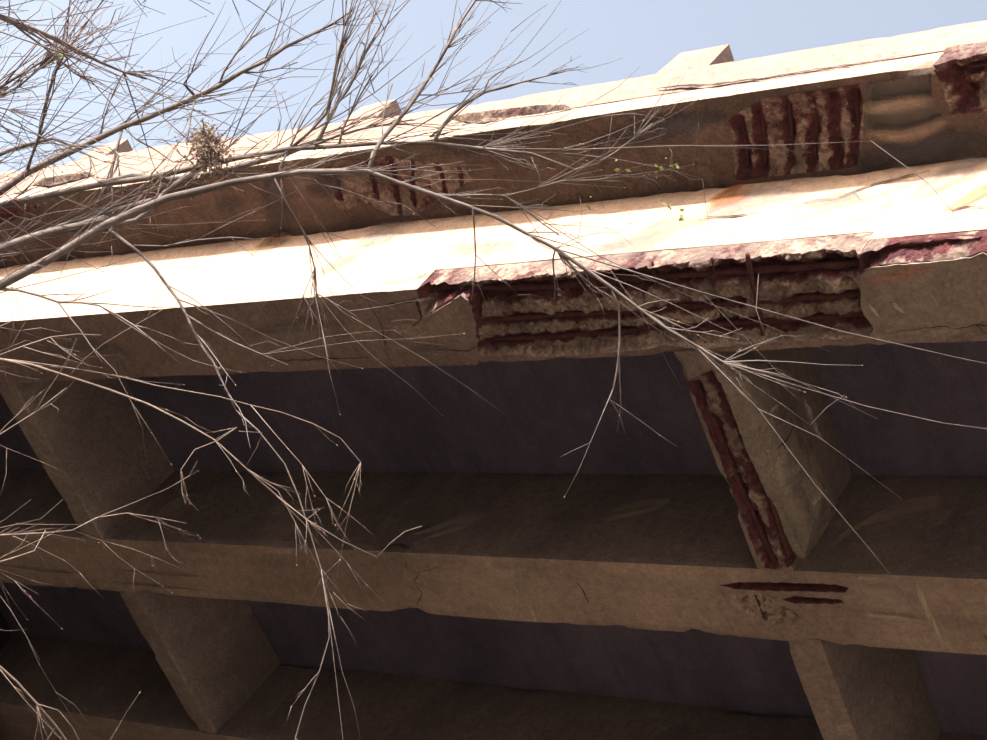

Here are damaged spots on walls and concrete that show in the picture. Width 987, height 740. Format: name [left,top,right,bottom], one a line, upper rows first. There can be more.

spalling [729,41,987,180]
spalling [317,156,475,216]
crack [265,270,441,361]
spalling [386,230,987,367]
crack [886,324,987,334]
spalling [687,369,797,570]
spalling [720,582,848,604]